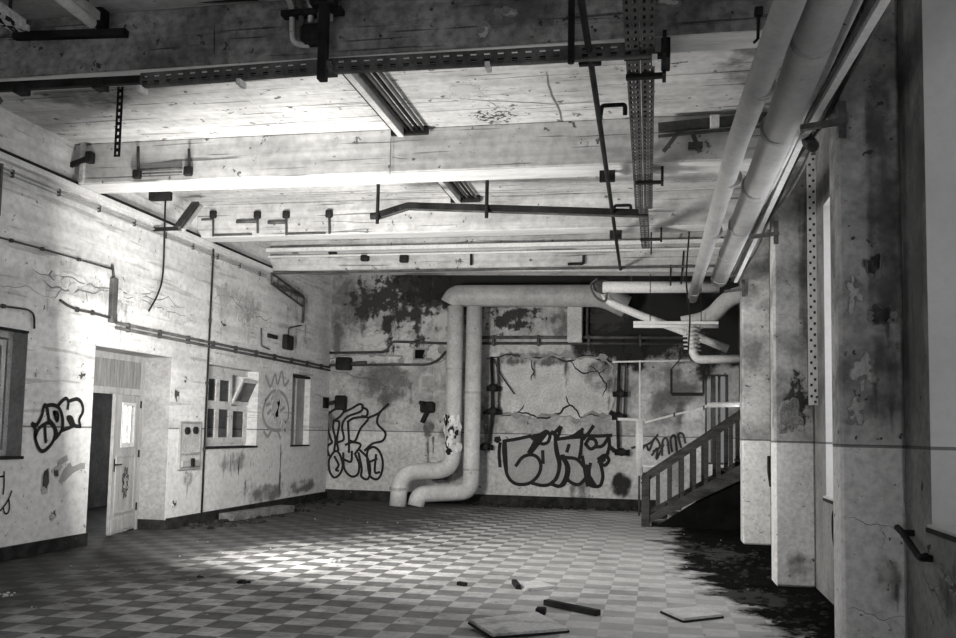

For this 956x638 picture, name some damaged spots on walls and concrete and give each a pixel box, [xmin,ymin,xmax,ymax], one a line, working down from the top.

peeling [0,13,32,34]
leakage [332,275,452,353]
crack [487,353,607,419]
peeling [777,397,804,434]
peeling [846,350,878,426]